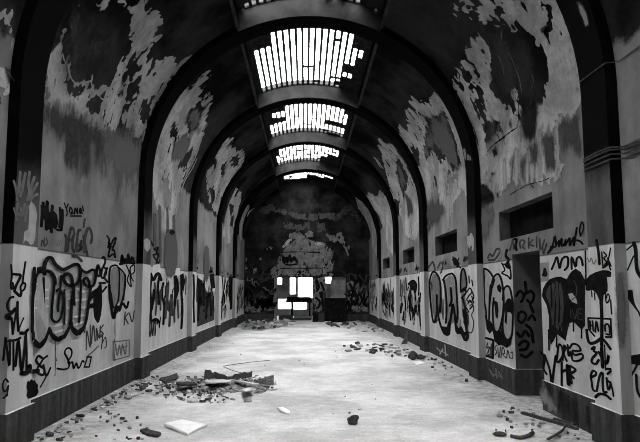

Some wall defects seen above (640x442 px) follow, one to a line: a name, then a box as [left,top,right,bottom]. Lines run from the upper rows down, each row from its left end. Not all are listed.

leakage [43,99,144,195]
peeling [44,0,192,143]
peeling [153,70,213,237]
peeling [206,137,419,313]
peeling [398,92,466,229]
crack [487,53,534,152]
peeling [452,0,581,196]
leakage [503,101,580,189]